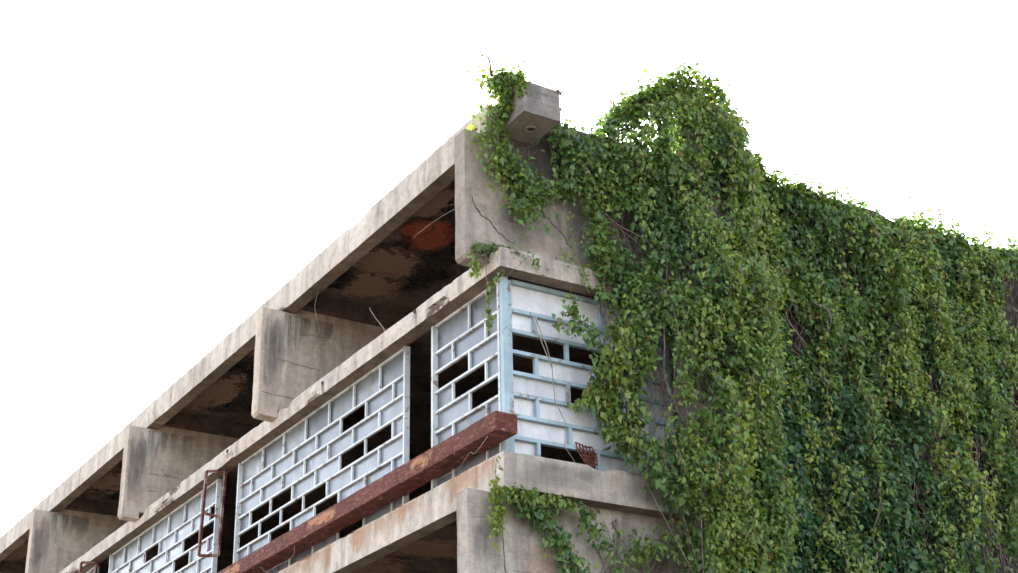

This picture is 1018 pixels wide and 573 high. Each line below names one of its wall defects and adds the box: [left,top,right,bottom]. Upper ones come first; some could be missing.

water stain [328,186,456,295]
crack [472,196,515,245]
rust [307,510,334,528]